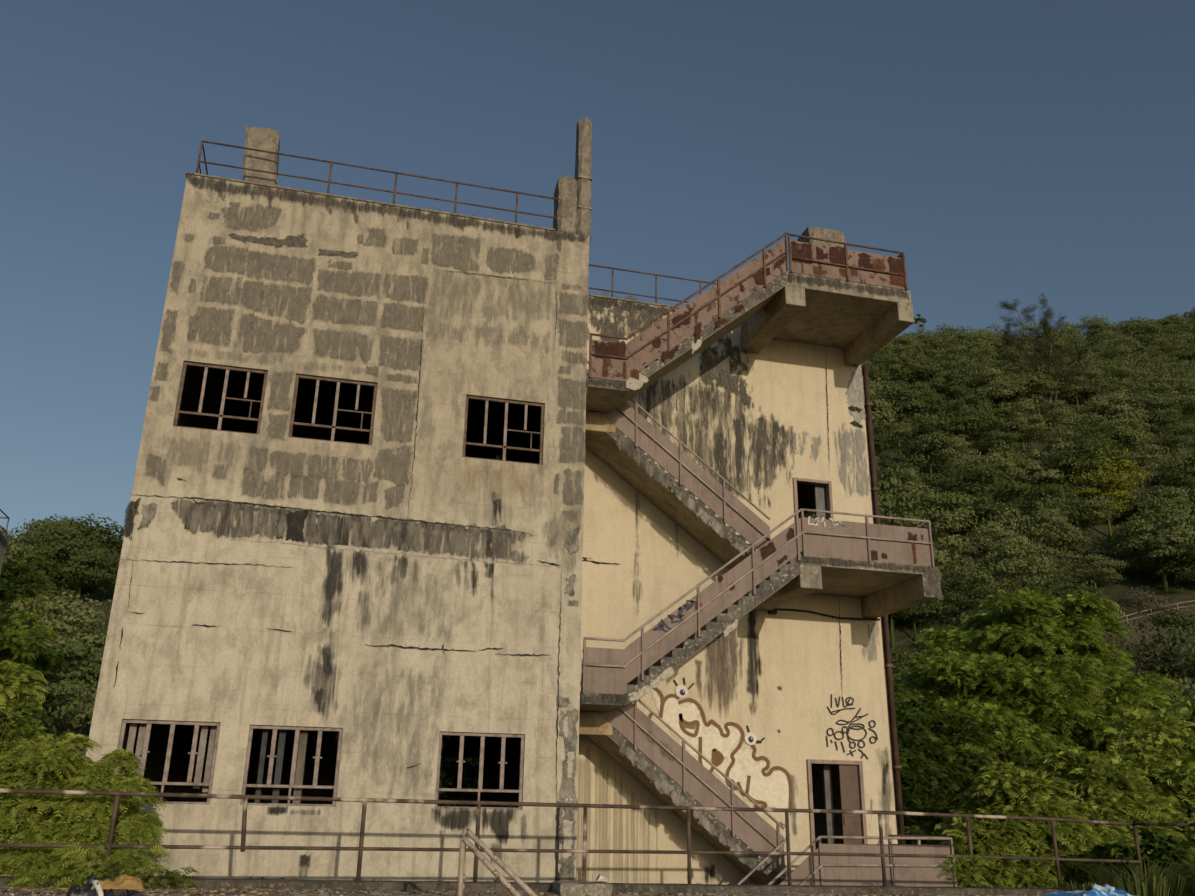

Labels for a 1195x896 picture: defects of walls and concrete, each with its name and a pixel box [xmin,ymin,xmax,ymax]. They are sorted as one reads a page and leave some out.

damp [187,174,587,250]
corrosion [672,241,906,343]
corrosion [595,341,639,379]
corrosion [653,336,679,361]
damp [589,335,871,505]
crack [113,269,618,803]
damp [492,493,501,523]
corrosion [760,528,795,566]
damp [305,547,417,713]
damp [695,610,761,712]